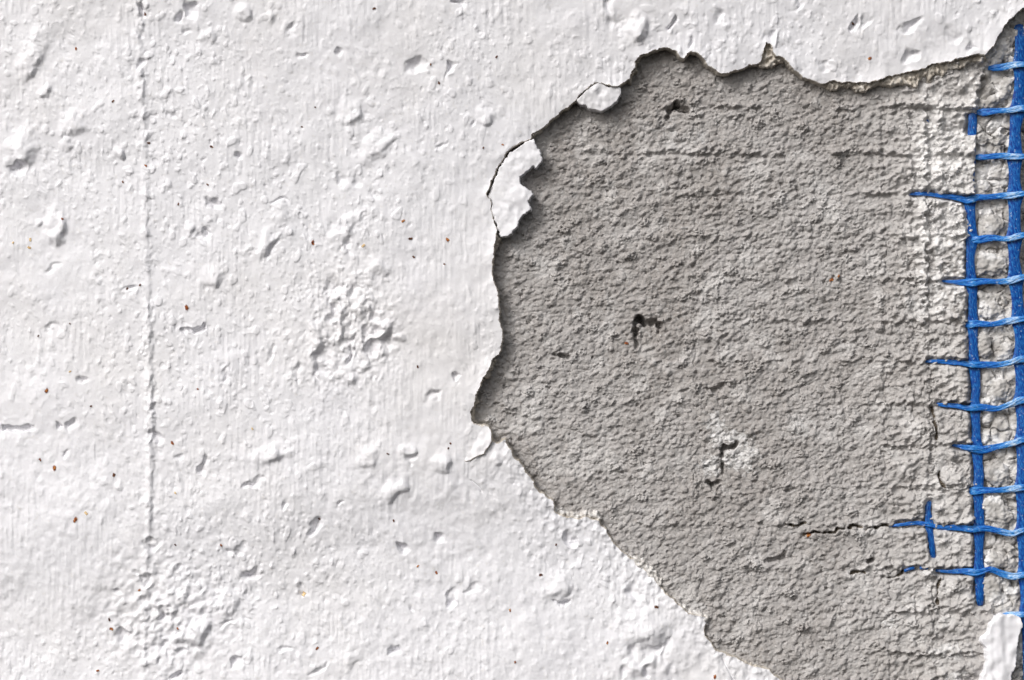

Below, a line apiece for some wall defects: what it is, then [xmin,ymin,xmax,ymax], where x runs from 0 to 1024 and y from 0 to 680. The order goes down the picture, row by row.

peeling [464,8,1024,680]
crack [789,522,889,537]
crack [850,570,903,578]